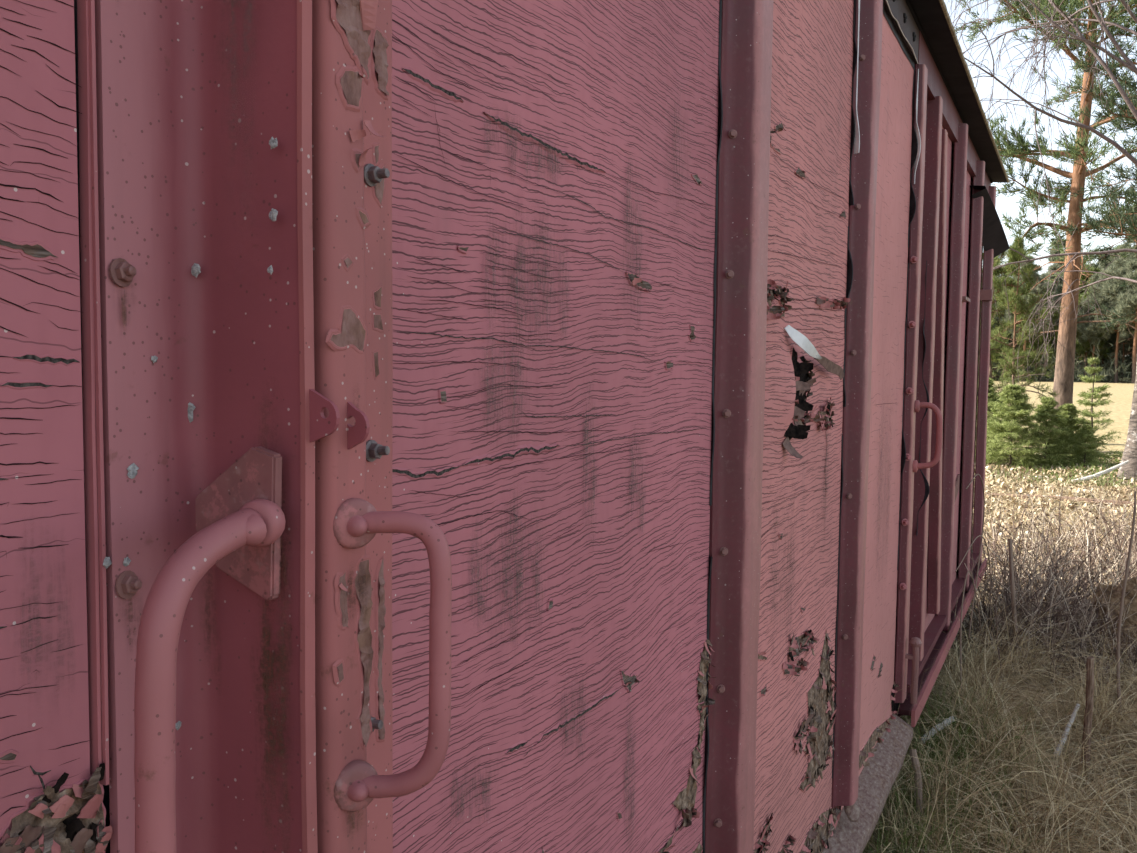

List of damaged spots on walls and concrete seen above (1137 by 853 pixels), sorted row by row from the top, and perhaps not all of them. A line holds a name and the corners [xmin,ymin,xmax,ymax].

crack [0,0,81,236]
peeling [330,0,390,229]
crack [0,257,83,630]
crack [392,19,711,525]
crack [766,234,845,347]
peeling [767,279,844,459]
crack [0,645,90,817]
peeling [0,763,113,853]
peeling [332,554,386,750]
crack [505,689,620,756]
peeling [756,807,838,853]
peeling [783,629,837,788]